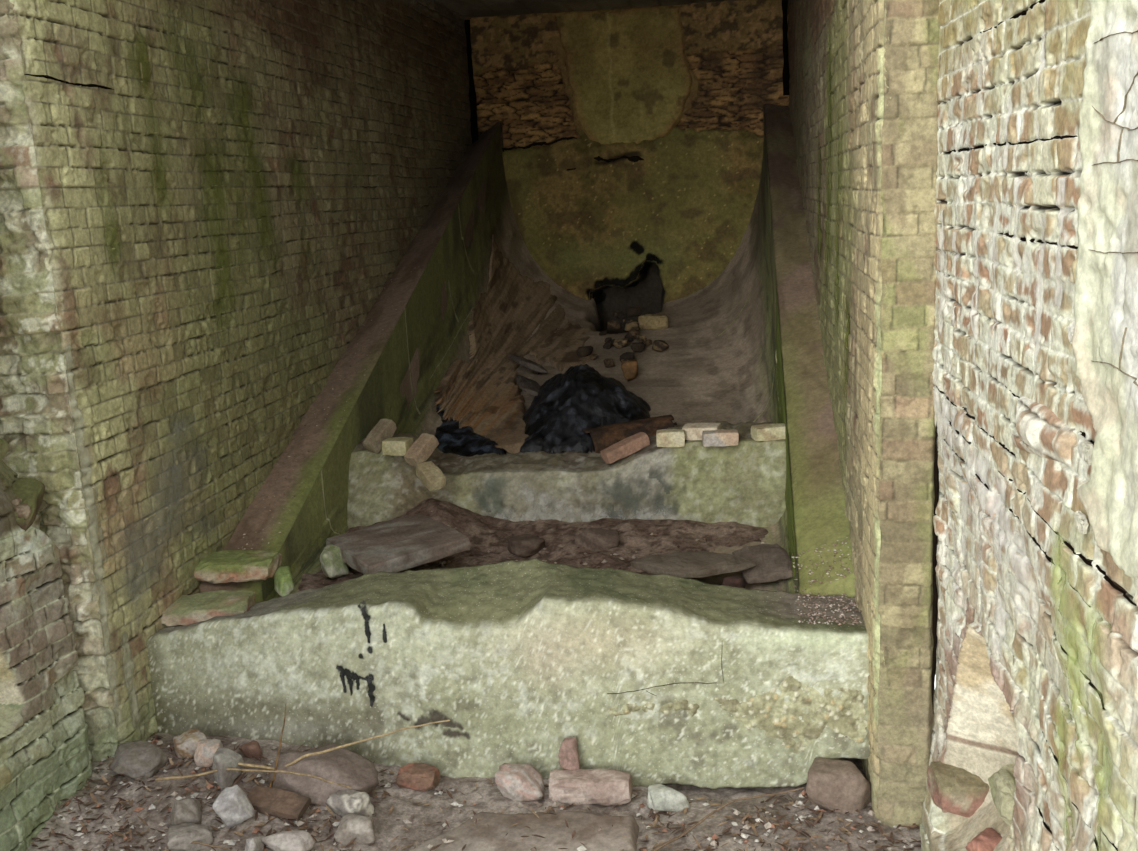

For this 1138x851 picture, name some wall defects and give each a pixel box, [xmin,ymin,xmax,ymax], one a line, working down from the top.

crack [24,74,115,90]
flaking render [470,6,789,152]
flaking render [1067,0,1138,579]
crack [1092,327,1138,386]
spalling [0,460,21,538]
crack [931,385,1137,713]